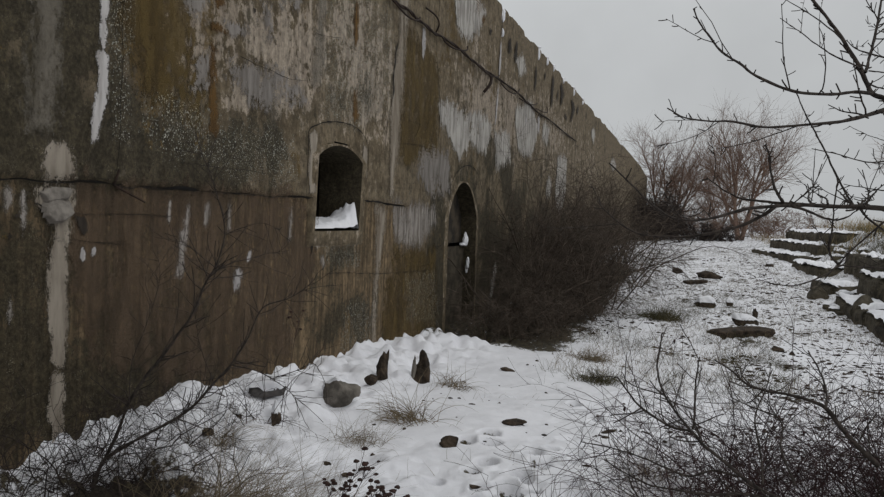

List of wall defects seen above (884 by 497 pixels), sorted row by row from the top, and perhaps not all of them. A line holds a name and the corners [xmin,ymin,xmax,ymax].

leakage [90,0,209,144]
crack [0,8,404,226]
peeling [188,41,309,113]
peeling [456,0,492,44]
peeling [438,38,579,172]
peeling [33,137,89,443]
leakage [64,165,324,391]